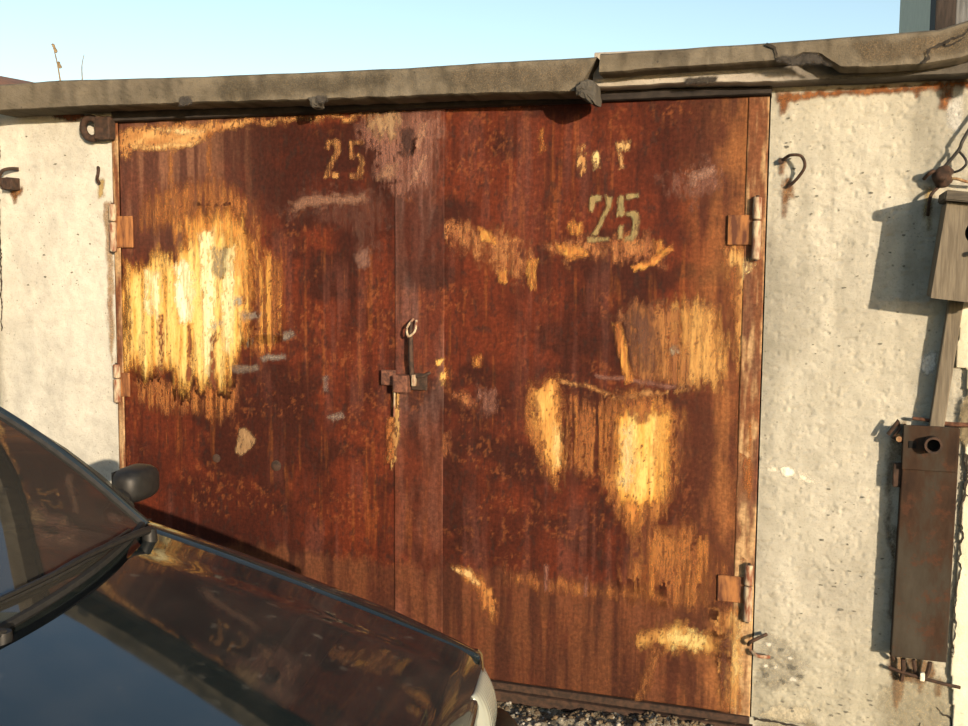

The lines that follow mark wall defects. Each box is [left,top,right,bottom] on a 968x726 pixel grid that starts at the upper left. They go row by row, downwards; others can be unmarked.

crack [922,30,968,64]
corrosion [777,80,968,114]
corrosion [780,160,793,214]
corrosion [139,131,282,355]
corrosion [132,374,239,426]
corrosion [453,389,496,411]
corrosion [506,374,728,611]
corrosion [456,567,497,620]
crack [754,717,797,726]